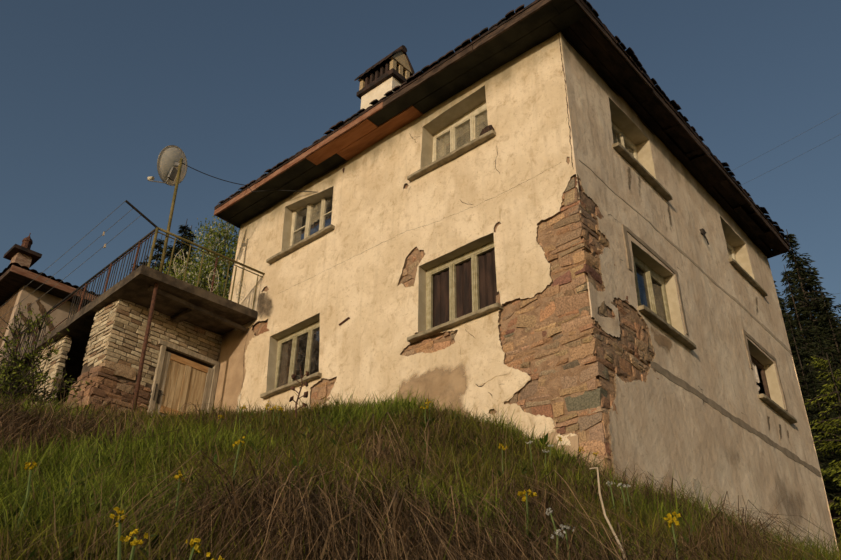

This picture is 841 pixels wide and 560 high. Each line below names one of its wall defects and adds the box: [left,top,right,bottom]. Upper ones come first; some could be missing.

crack [333,33,573,267]
flaking render [310,378,336,407]
flaking render [389,157,822,479]